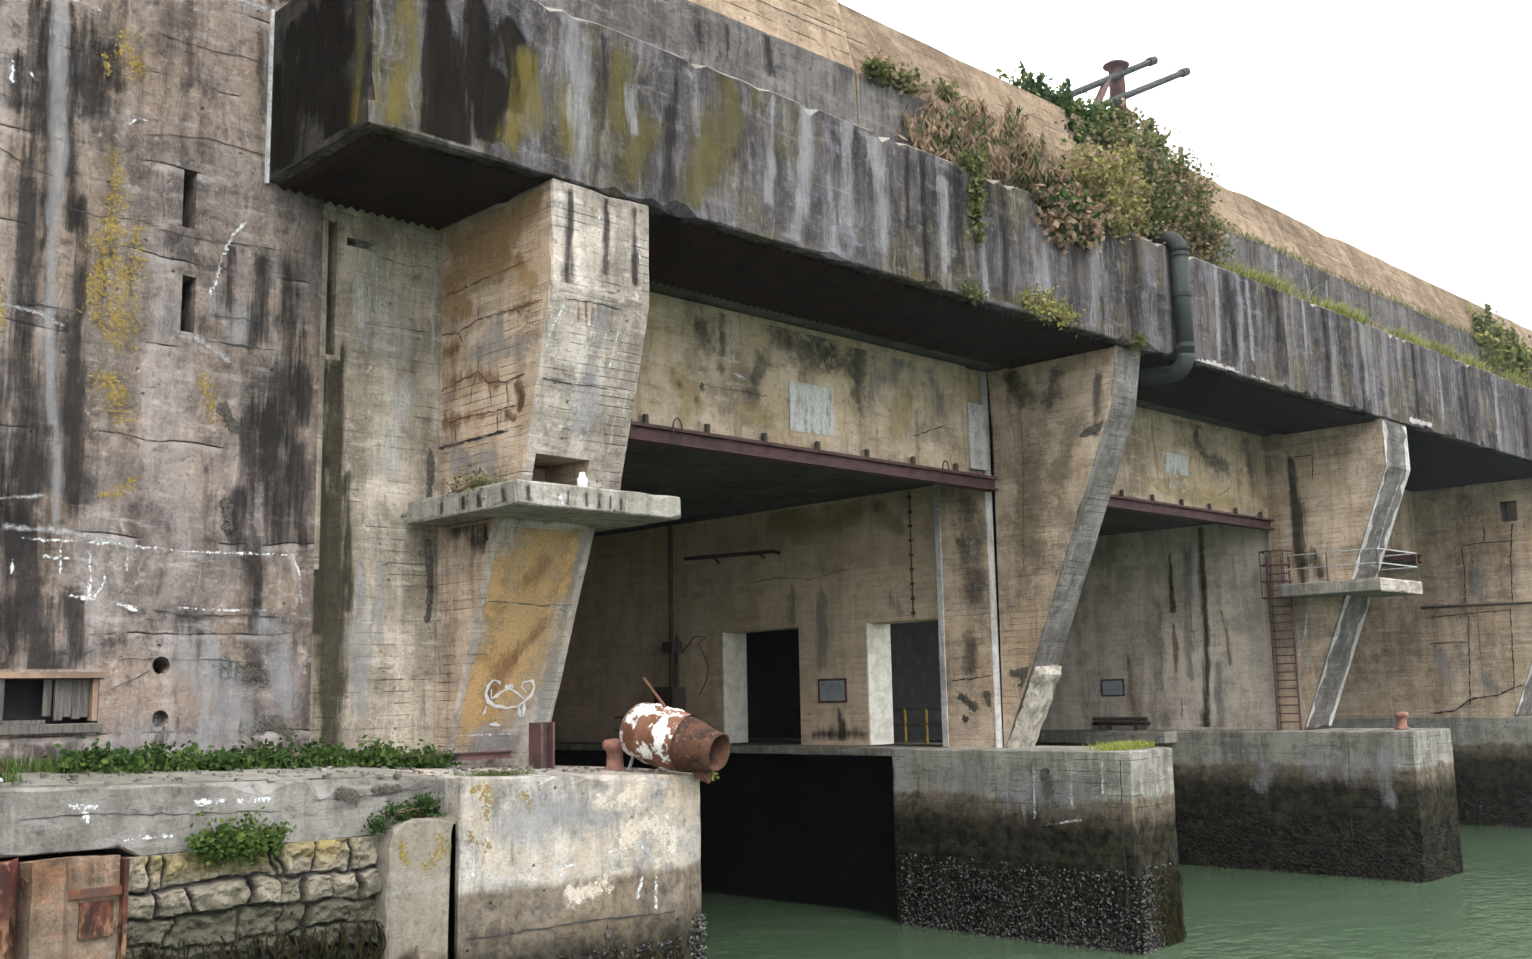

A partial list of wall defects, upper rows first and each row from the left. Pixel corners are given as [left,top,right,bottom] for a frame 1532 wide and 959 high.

damp [420,0,537,146]
damp [659,60,679,204]
damp [764,34,774,74]
damp [0,0,125,669]
damp [209,222,247,309]
crack [365,257,619,450]
damp [905,147,930,277]
damp [953,176,962,260]
damp [126,253,354,748]